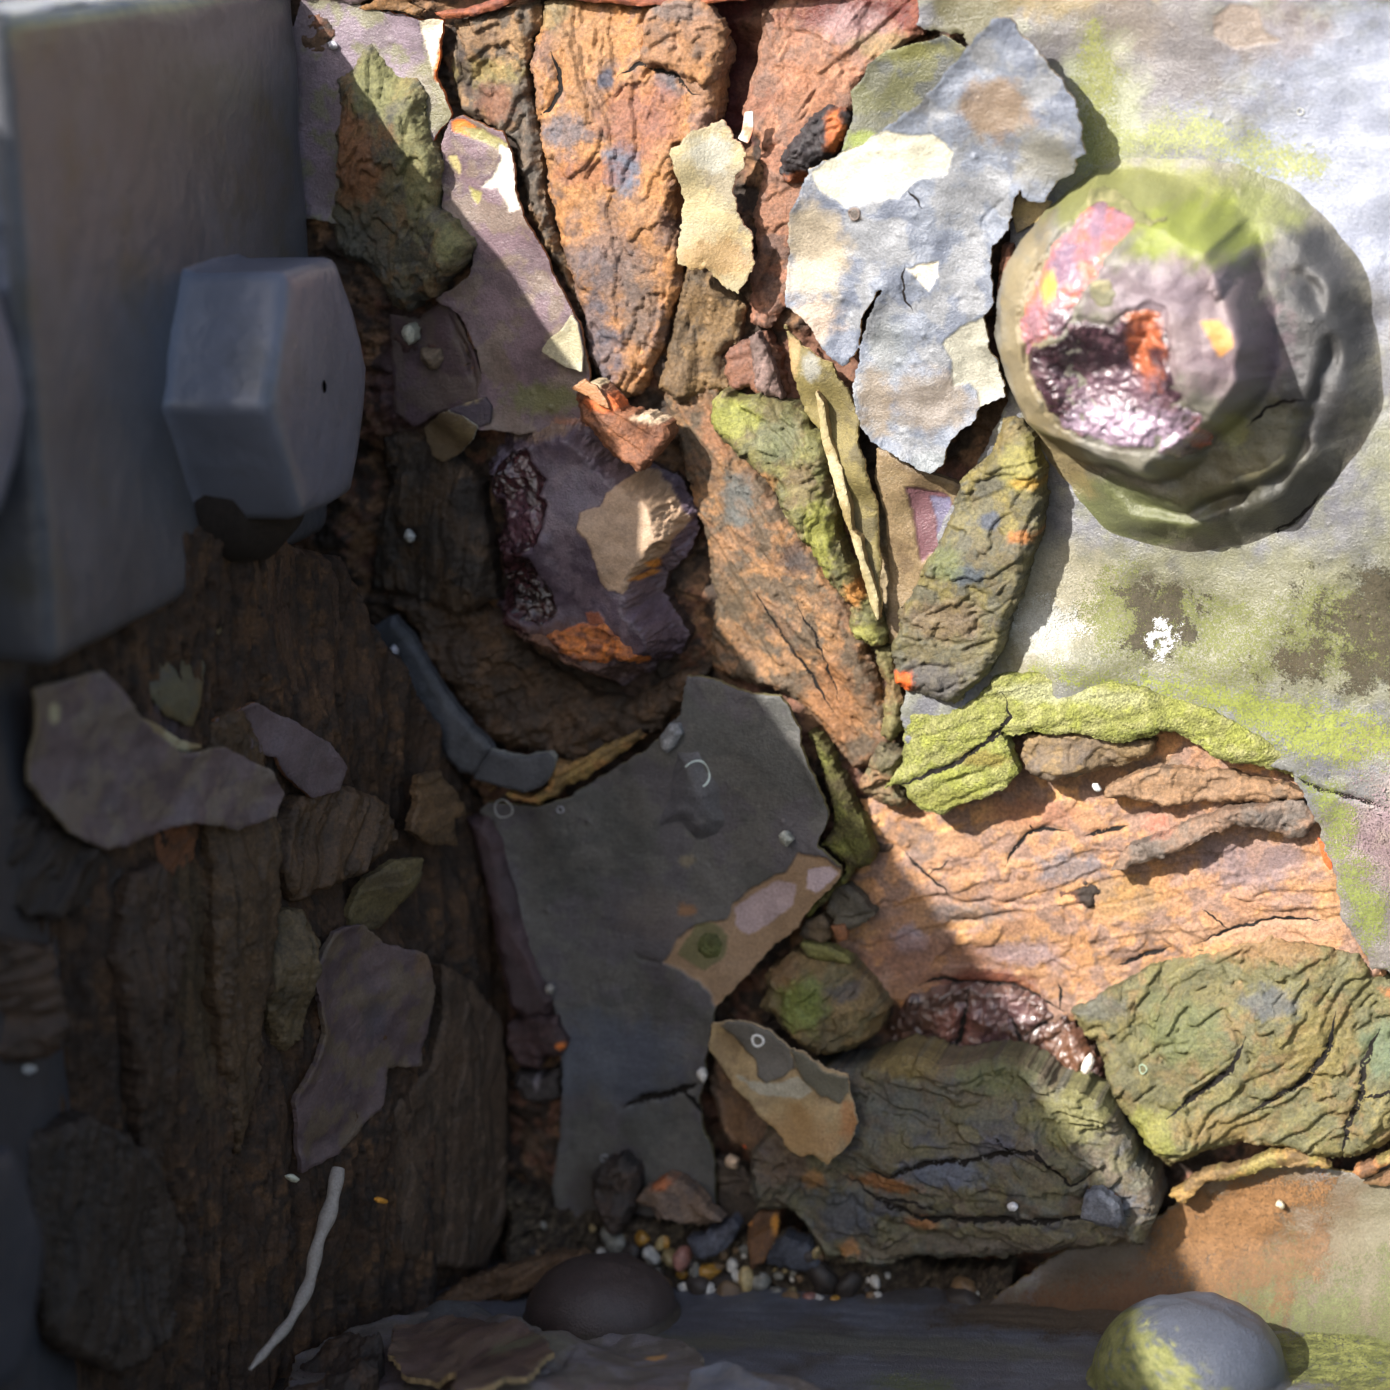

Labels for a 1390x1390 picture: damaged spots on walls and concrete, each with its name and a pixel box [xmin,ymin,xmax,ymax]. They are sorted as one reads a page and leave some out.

rust [363,0,602,382]
peeling [293,0,679,679]
peeling [669,111,756,294]
rust [626,0,882,416]
peeling [724,17,1086,743]
rust [934,190,1022,481]
rust [1019,201,1214,460]
rust [6,218,681,1390]
rust [534,526,1387,1058]
peeling [290,924,436,1173]
peeling [708,1019,859,1165]
spalling [889,981,1106,1079]